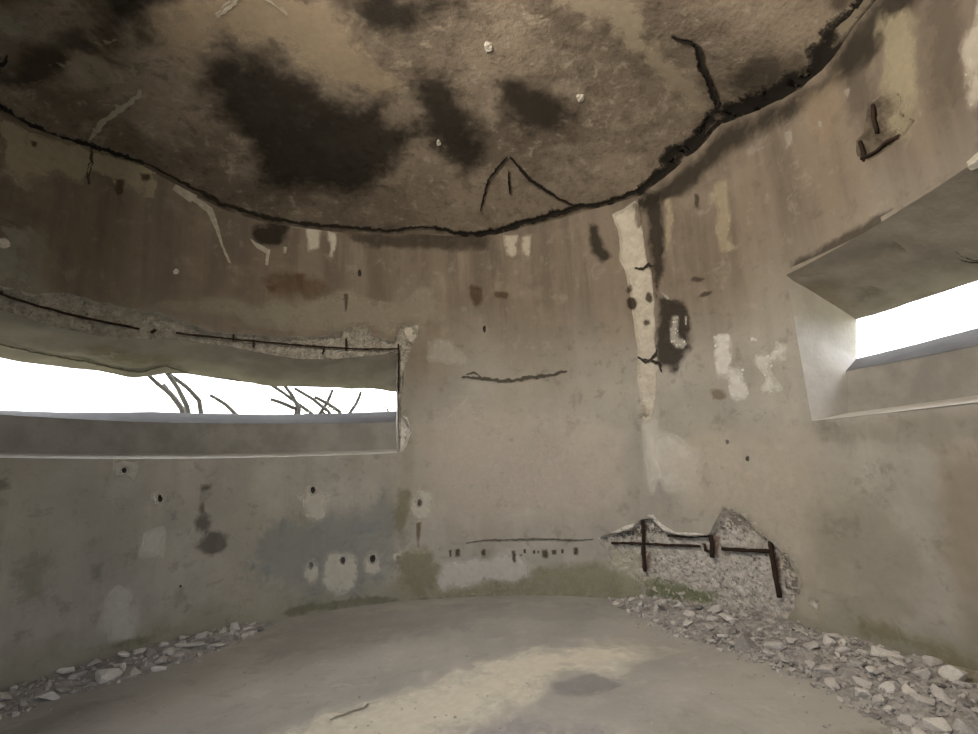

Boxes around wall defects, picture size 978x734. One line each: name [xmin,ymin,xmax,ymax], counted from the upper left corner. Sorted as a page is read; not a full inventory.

damp [100,0,393,91]
damp [356,0,442,30]
damp [928,0,978,106]
damp [206,51,484,194]
crack [0,0,876,237]
spalling [856,91,915,162]
crack [462,370,567,383]
spalling [612,201,669,421]
damp [656,298,690,371]
peeling [671,317,687,347]
peeling [714,335,748,398]
spalling [598,509,820,619]